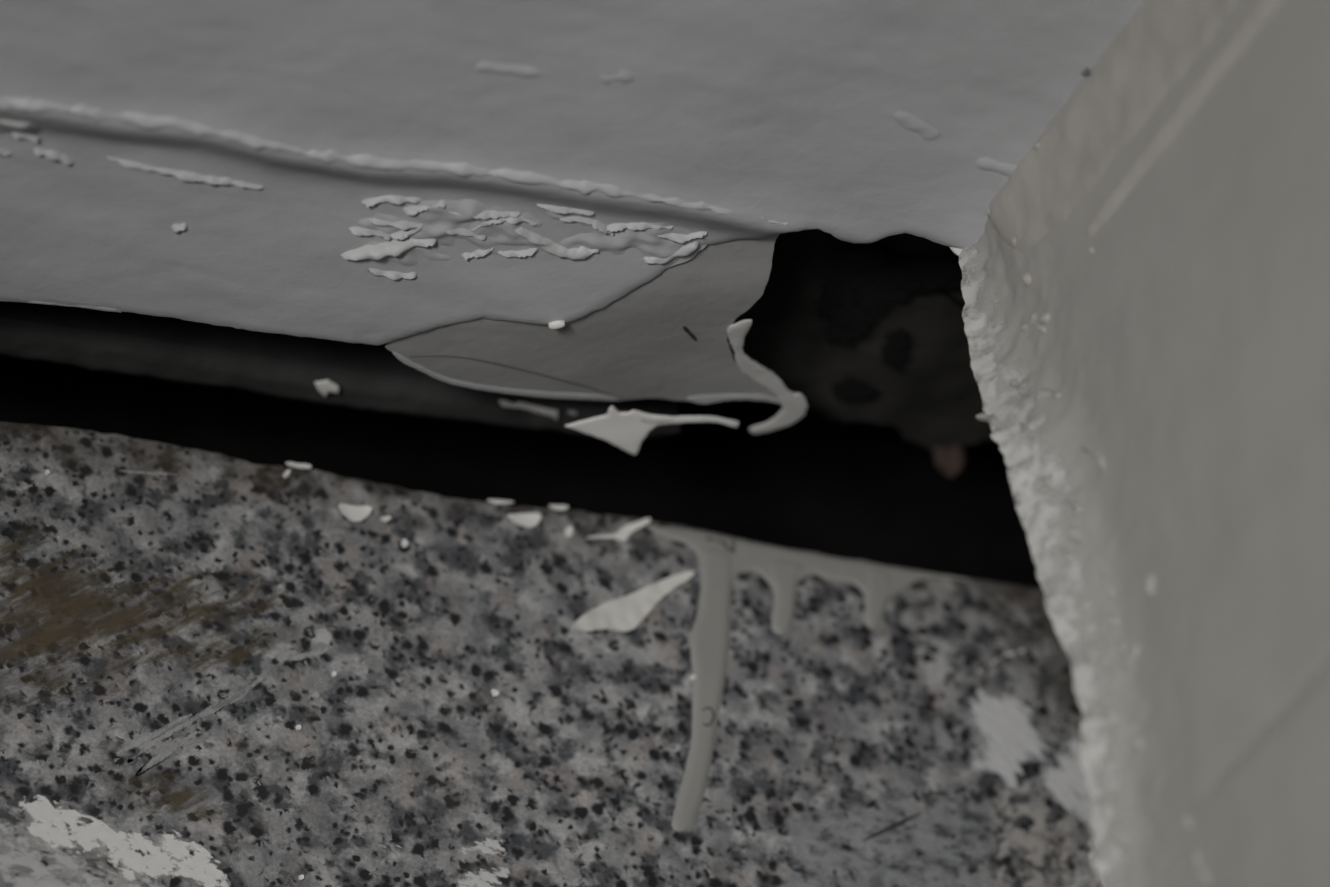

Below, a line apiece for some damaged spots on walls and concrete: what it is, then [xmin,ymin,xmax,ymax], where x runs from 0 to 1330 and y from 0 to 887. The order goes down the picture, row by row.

peeling [340,195,808,455]